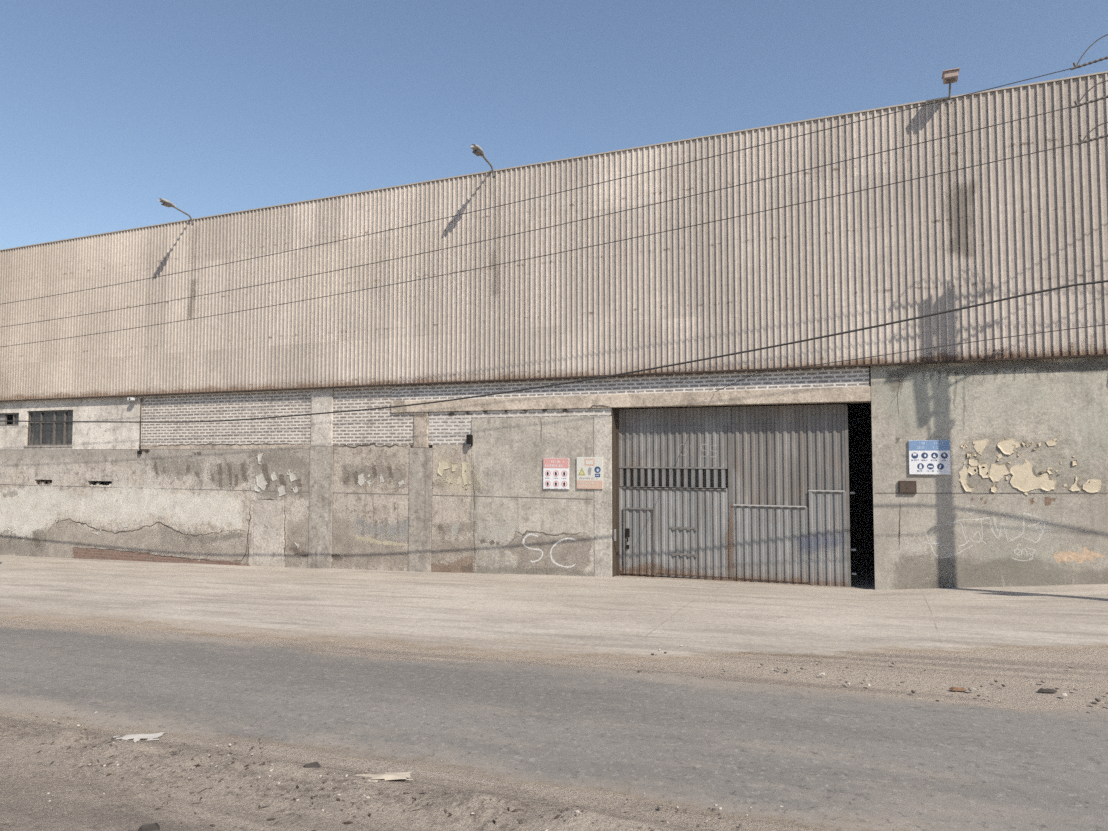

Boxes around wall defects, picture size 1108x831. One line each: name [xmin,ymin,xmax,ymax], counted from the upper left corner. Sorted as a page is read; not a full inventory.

leakage [949,184,975,257]
rust [777,341,1108,368]
leakage [887,358,1108,391]
peeling [956,437,1101,495]
peeling [0,443,310,568]
flaking render [322,514,408,569]